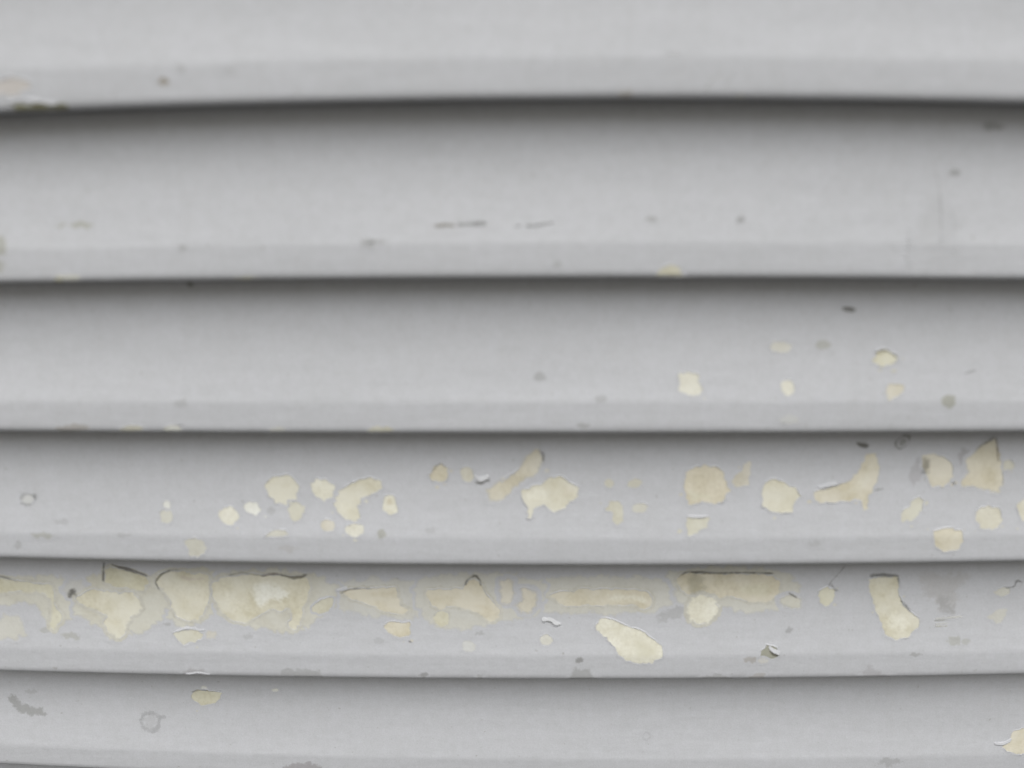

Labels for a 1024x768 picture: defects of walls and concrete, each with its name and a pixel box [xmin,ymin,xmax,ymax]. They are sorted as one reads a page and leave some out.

peeling [676,370,706,400]
peeling [217,473,400,543]
peeling [428,445,581,521]
peeling [676,463,735,538]
peeling [759,441,883,521]
peeling [892,433,1024,554]
peeling [0,536,805,665]
peeling [866,573,923,642]
peeling [190,684,224,713]